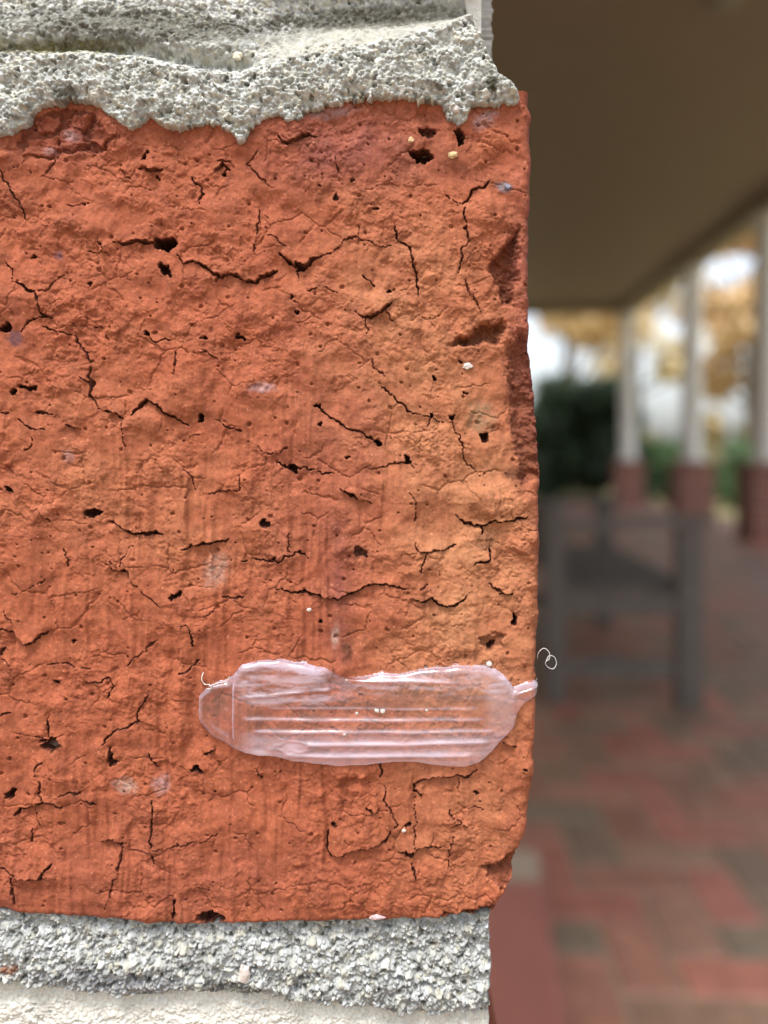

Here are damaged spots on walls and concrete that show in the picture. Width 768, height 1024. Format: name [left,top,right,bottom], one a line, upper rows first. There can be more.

crack [191,152,268,204]
crack [87,211,420,295]
crack [355,275,394,334]
crack [446,181,489,310]
crack [1,263,373,503]
crack [368,359,480,477]
crack [109,521,163,605]
crack [243,493,527,608]
crack [0,864,52,904]
crack [13,721,95,843]
crack [101,801,218,909]
crack [326,761,481,877]